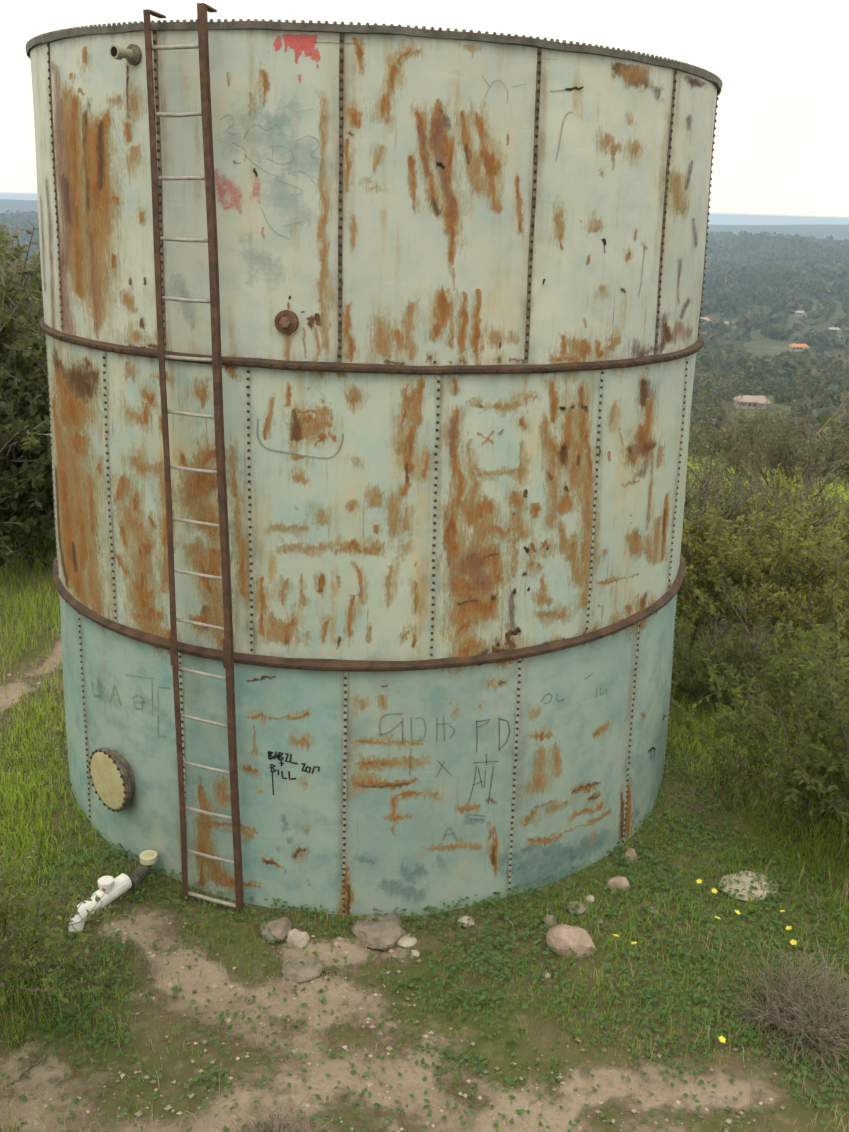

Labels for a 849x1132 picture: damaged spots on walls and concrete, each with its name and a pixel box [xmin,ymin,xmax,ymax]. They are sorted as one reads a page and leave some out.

rust [40,64,158,348]
rust [317,97,330,350]
rust [380,46,420,122]
rust [408,100,524,365]
rust [52,347,101,615]
rust [114,444,341,650]
rust [263,378,430,646]
rust [444,380,639,666]
rust [550,263,692,565]
rust [194,780,260,888]
rust [351,739,439,836]
rust [524,732,632,846]